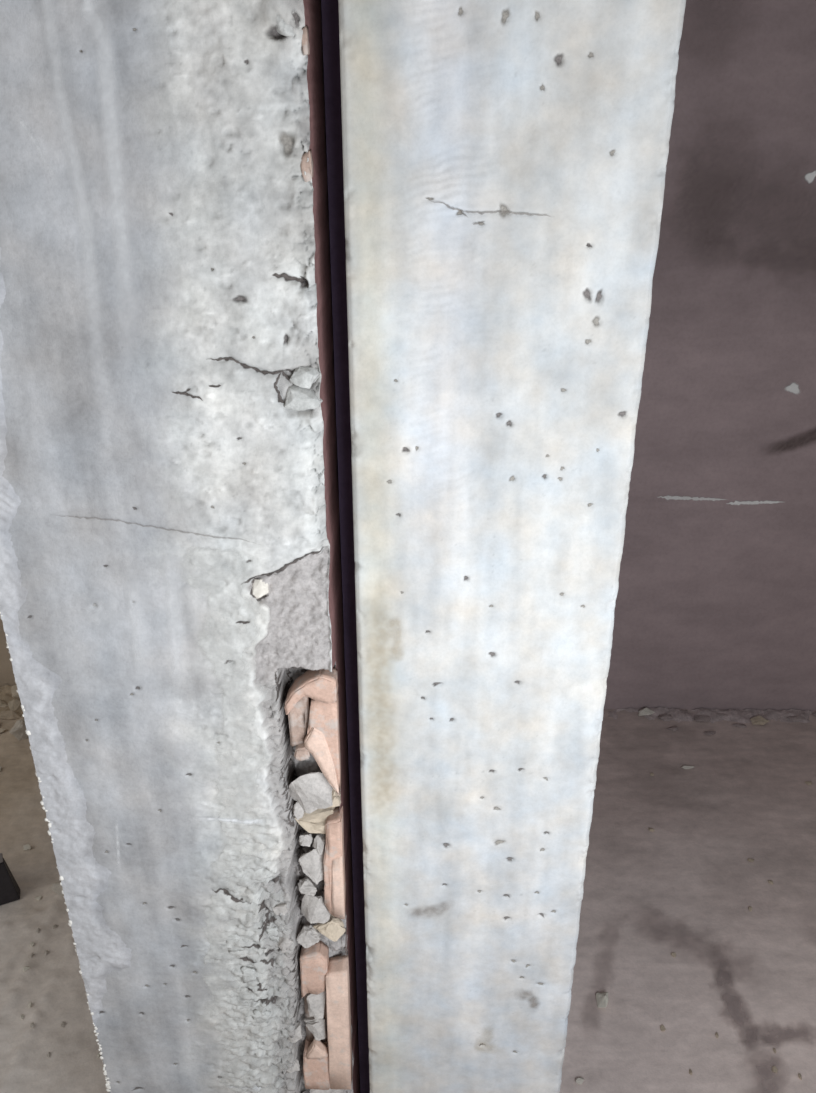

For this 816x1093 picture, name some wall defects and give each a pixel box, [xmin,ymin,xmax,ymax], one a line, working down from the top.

crack [172,357,314,403]
crack [429,200,548,225]
crack [213,667,305,1025]
peeling [188,548,354,1093]